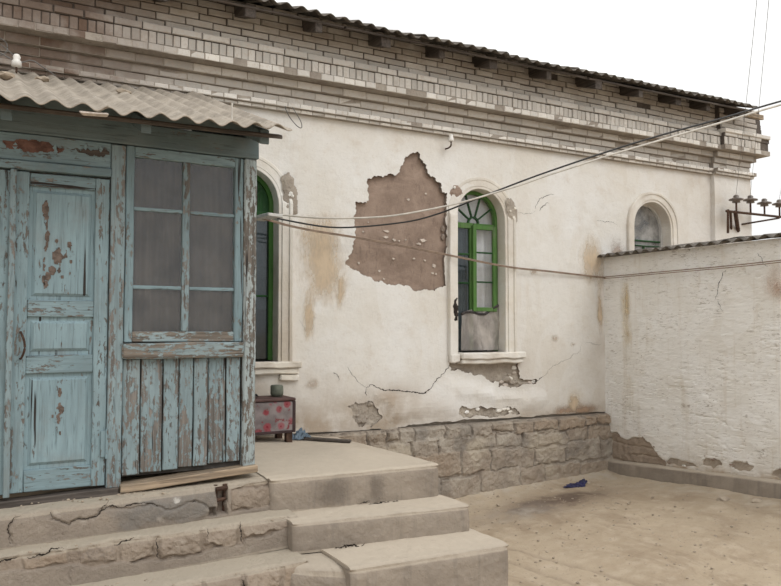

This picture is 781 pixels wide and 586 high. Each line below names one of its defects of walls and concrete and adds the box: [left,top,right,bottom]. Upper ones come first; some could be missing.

peeling [3,139,109,157]
flaking render [280,172,298,215]
flaking render [345,153,463,291]
peeling [42,200,72,289]
crack [334,368,448,396]
flaking render [449,363,535,387]
flaking render [348,401,382,427]
flaking render [459,406,519,420]
flaking render [611,430,754,471]
crack [50,502,157,525]
crack [0,516,64,563]